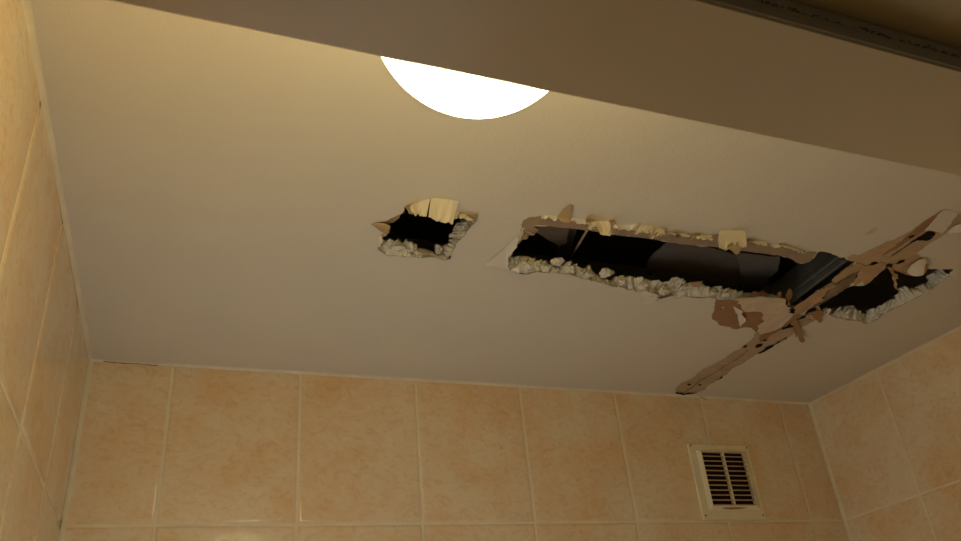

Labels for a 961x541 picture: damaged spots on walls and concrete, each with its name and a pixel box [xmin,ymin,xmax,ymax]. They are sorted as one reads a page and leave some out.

spalling [378,220,476,260]
peeling [847,209,961,265]
spalling [508,256,802,394]
spalling [821,270,950,324]